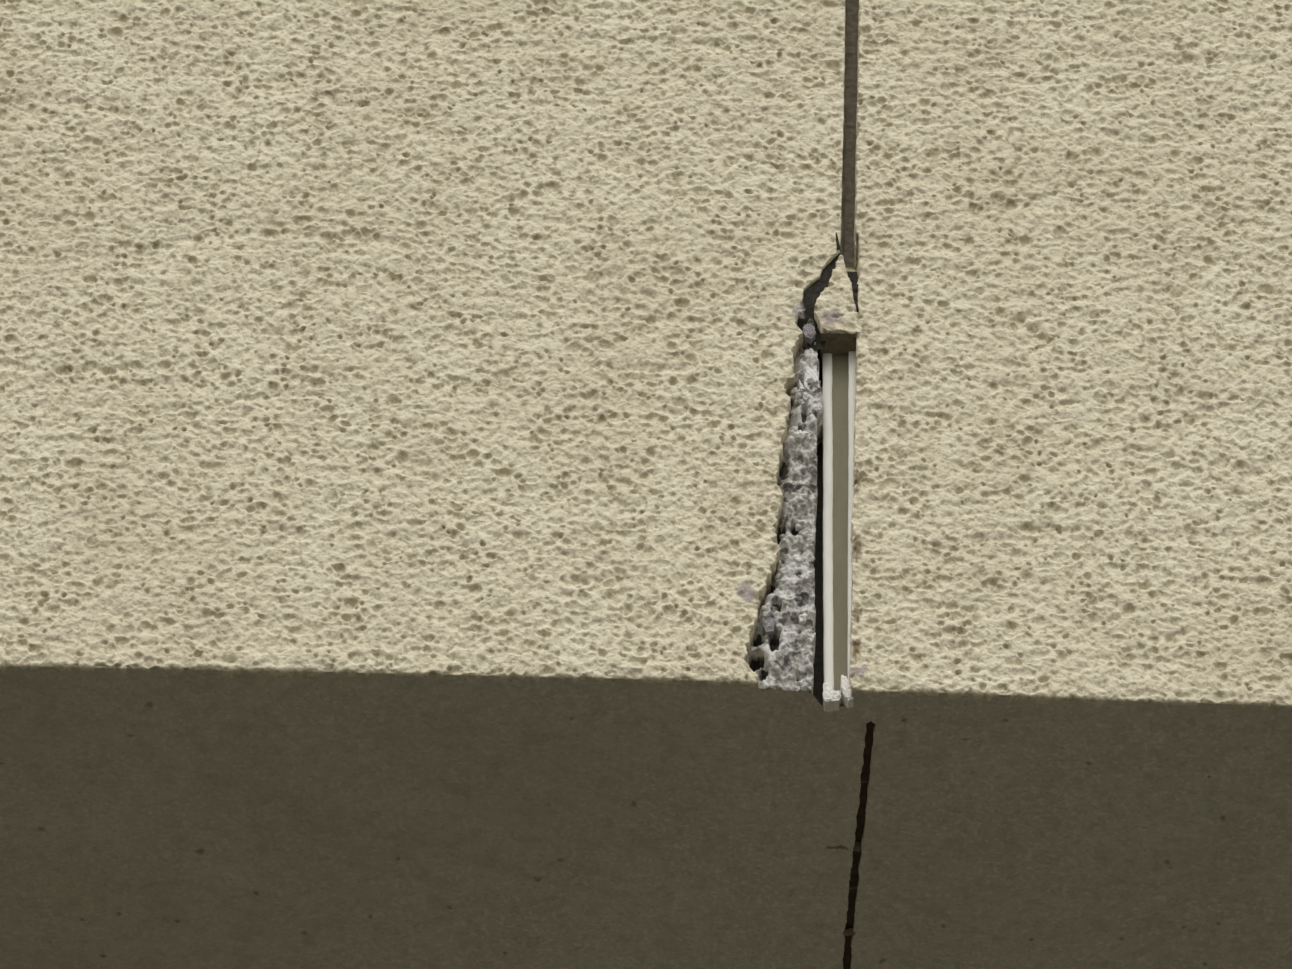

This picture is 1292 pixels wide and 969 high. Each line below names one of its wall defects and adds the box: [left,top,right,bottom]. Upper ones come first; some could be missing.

crack [797,232,859,387]
spalling [748,318,824,694]
crack [813,440,824,706]